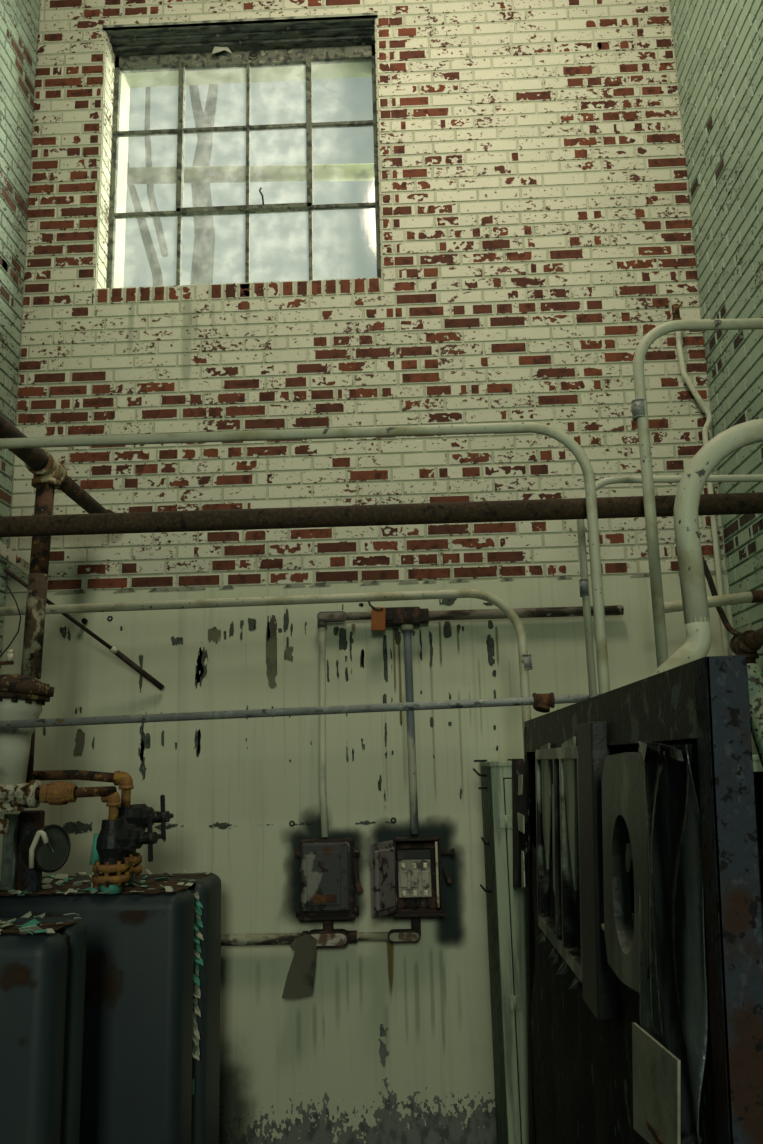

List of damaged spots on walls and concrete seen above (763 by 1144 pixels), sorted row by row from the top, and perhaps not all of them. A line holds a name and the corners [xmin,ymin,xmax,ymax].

peeling [50,0,199,39]
peeling [0,6,743,489]
peeling [47,522,566,590]
peeling [599,534,624,544]
peeling [601,563,627,573]
peeling [664,546,679,571]
peeling [195,609,307,689]
peeling [327,627,364,682]
peeling [383,621,464,704]
peeling [486,620,496,699]
peeling [73,729,95,757]
peeling [138,708,177,781]